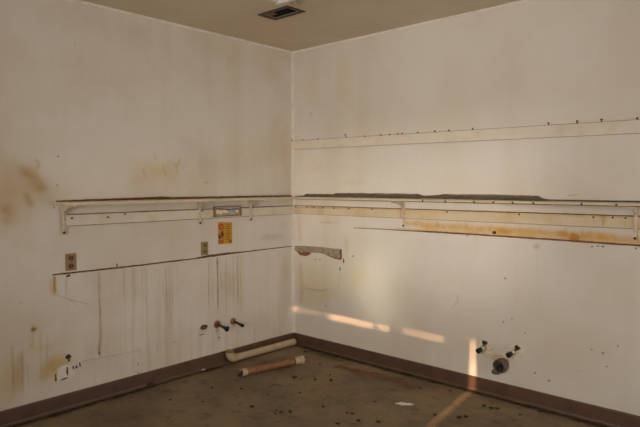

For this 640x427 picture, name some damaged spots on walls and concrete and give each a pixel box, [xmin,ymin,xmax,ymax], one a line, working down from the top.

corrosion [384,208,640,217]
peeling [295,246,344,270]